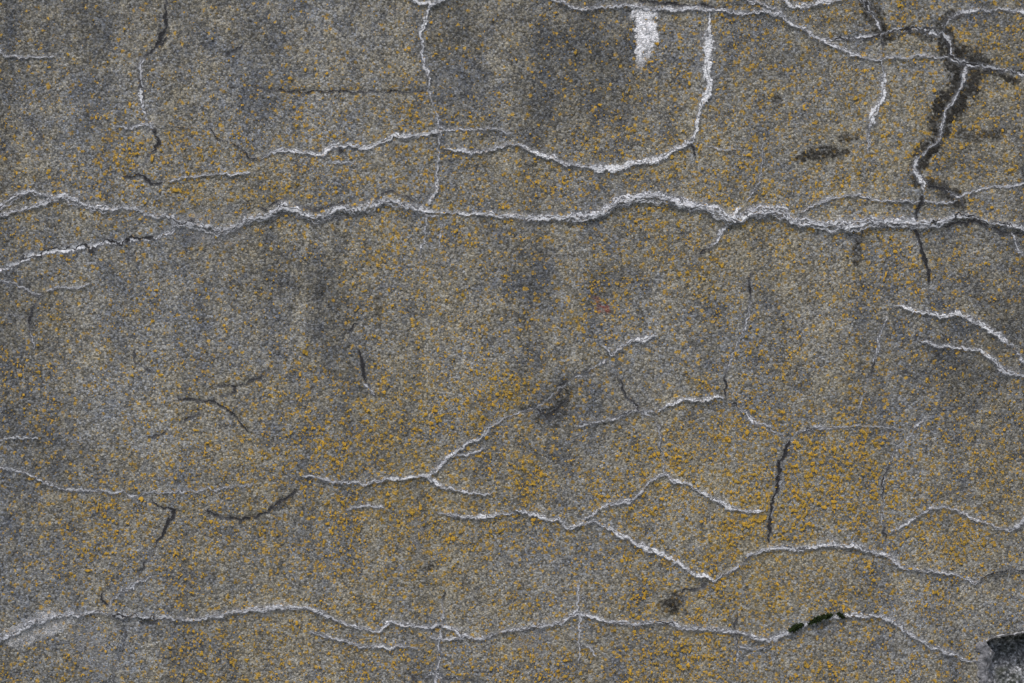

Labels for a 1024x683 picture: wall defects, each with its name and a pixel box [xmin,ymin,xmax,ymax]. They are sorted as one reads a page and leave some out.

crack [0,0,1024,349]
leakage [859,0,1019,212]
crack [0,272,1024,683]